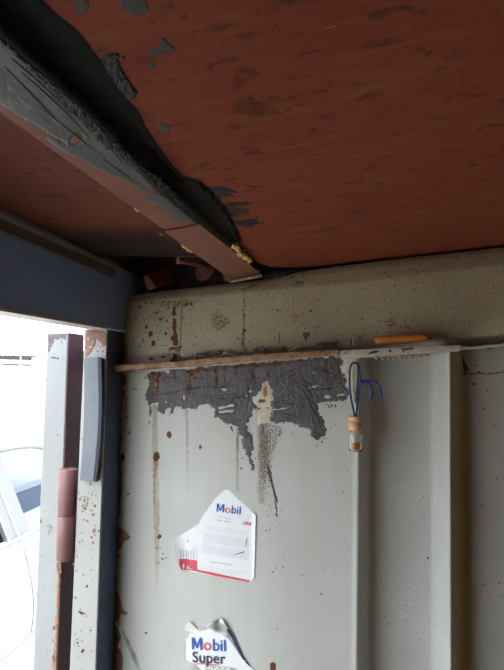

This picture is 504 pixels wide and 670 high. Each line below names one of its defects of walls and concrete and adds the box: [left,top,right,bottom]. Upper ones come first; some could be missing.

rust [134,298,201,346]
peeling [47,334,67,359]
peeling [85,329,106,357]
rust [147,371,170,391]
peeling [341,358,352,385]
peeling [253,381,272,425]